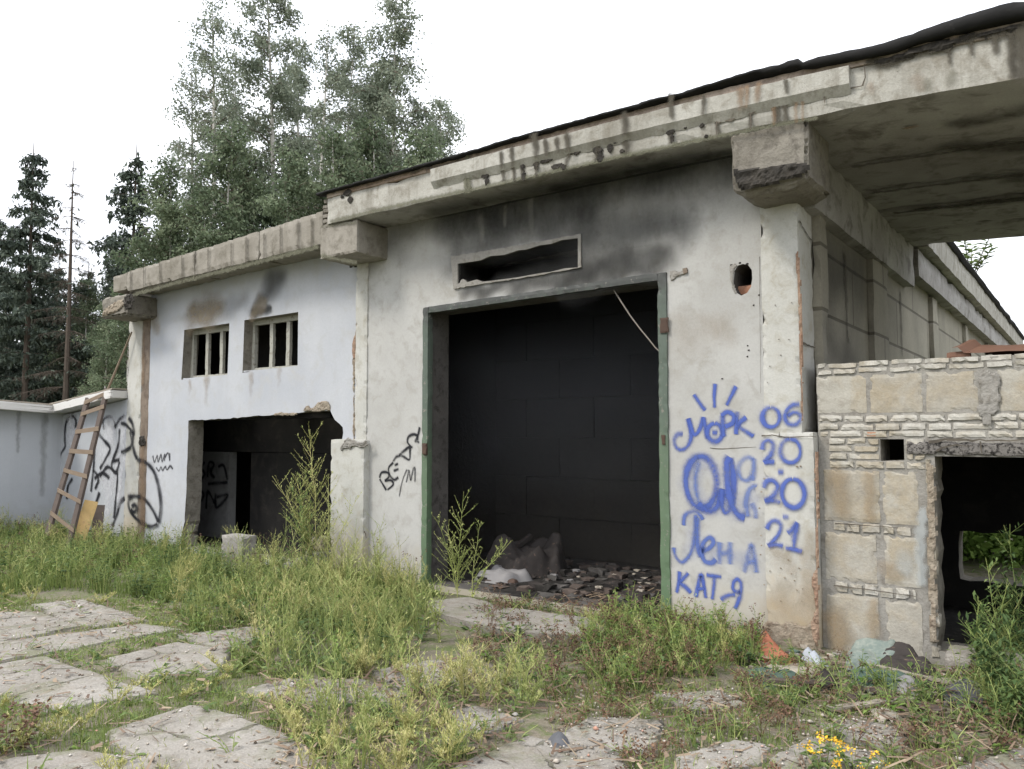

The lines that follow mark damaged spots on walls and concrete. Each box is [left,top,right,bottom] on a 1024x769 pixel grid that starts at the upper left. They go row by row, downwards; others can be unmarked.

spalling [520,142,625,181]
spalling [733,162,810,191]
water stain [130,219,357,296]
spalling [102,294,135,316]
spalling [273,401,331,416]